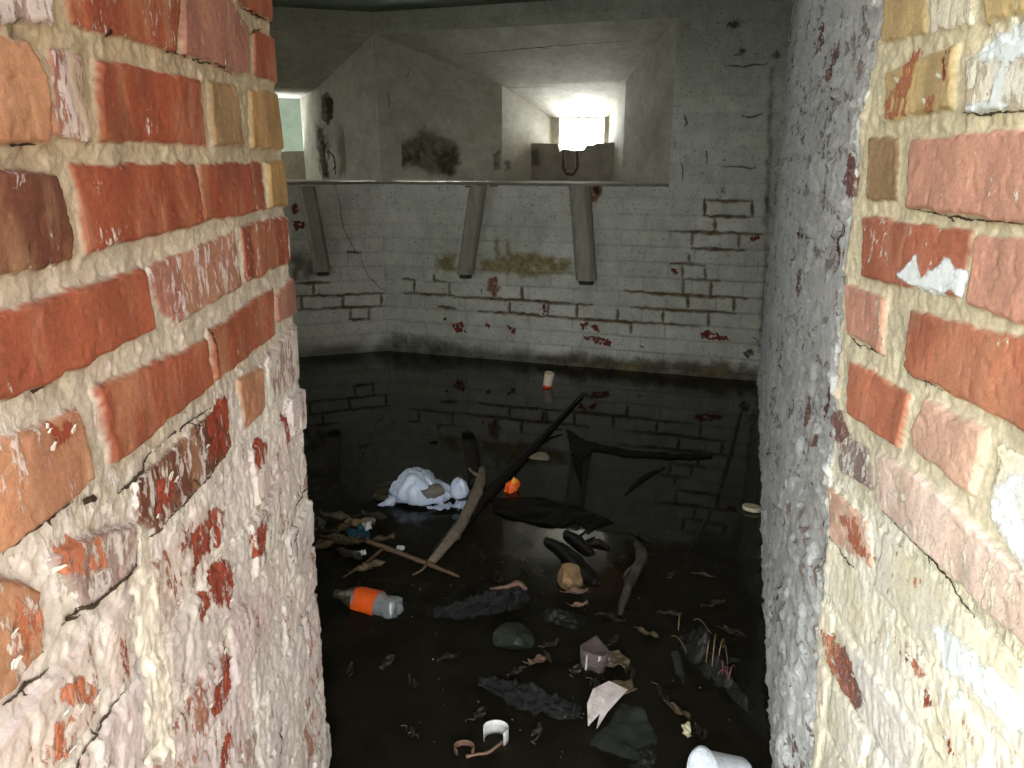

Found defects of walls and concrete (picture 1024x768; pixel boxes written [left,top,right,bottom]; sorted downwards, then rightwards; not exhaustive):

water stain [401,132,458,174]
water stain [482,240,570,277]
water stain [538,354,755,381]
crack [118,408,211,495]
peeling [249,436,268,474]
crack [148,456,226,539]
crack [61,564,137,626]
peeling [190,505,237,622]
peeling [249,514,271,564]
crack [882,511,975,618]
peeling [209,648,233,716]
peeling [46,675,103,763]